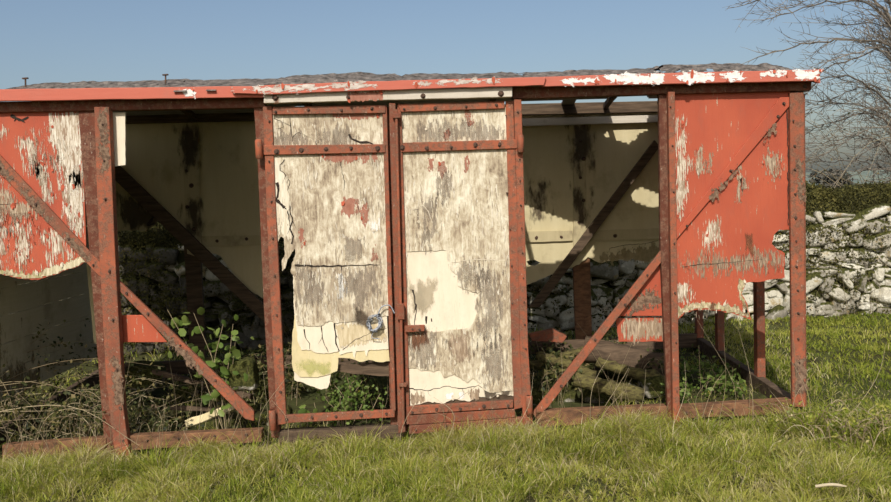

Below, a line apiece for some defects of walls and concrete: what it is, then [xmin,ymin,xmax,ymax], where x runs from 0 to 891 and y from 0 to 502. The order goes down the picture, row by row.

peeling [413,77,501,88]
peeling [561,69,746,87]
peeling [760,68,823,82]
peeling [0,112,96,275]
peeling [275,155,293,241]
peeling [675,114,714,218]
peeling [709,164,751,202]
peeling [759,123,808,202]
peeling [700,214,721,250]
peeling [678,282,694,307]
peeling [444,328,477,367]